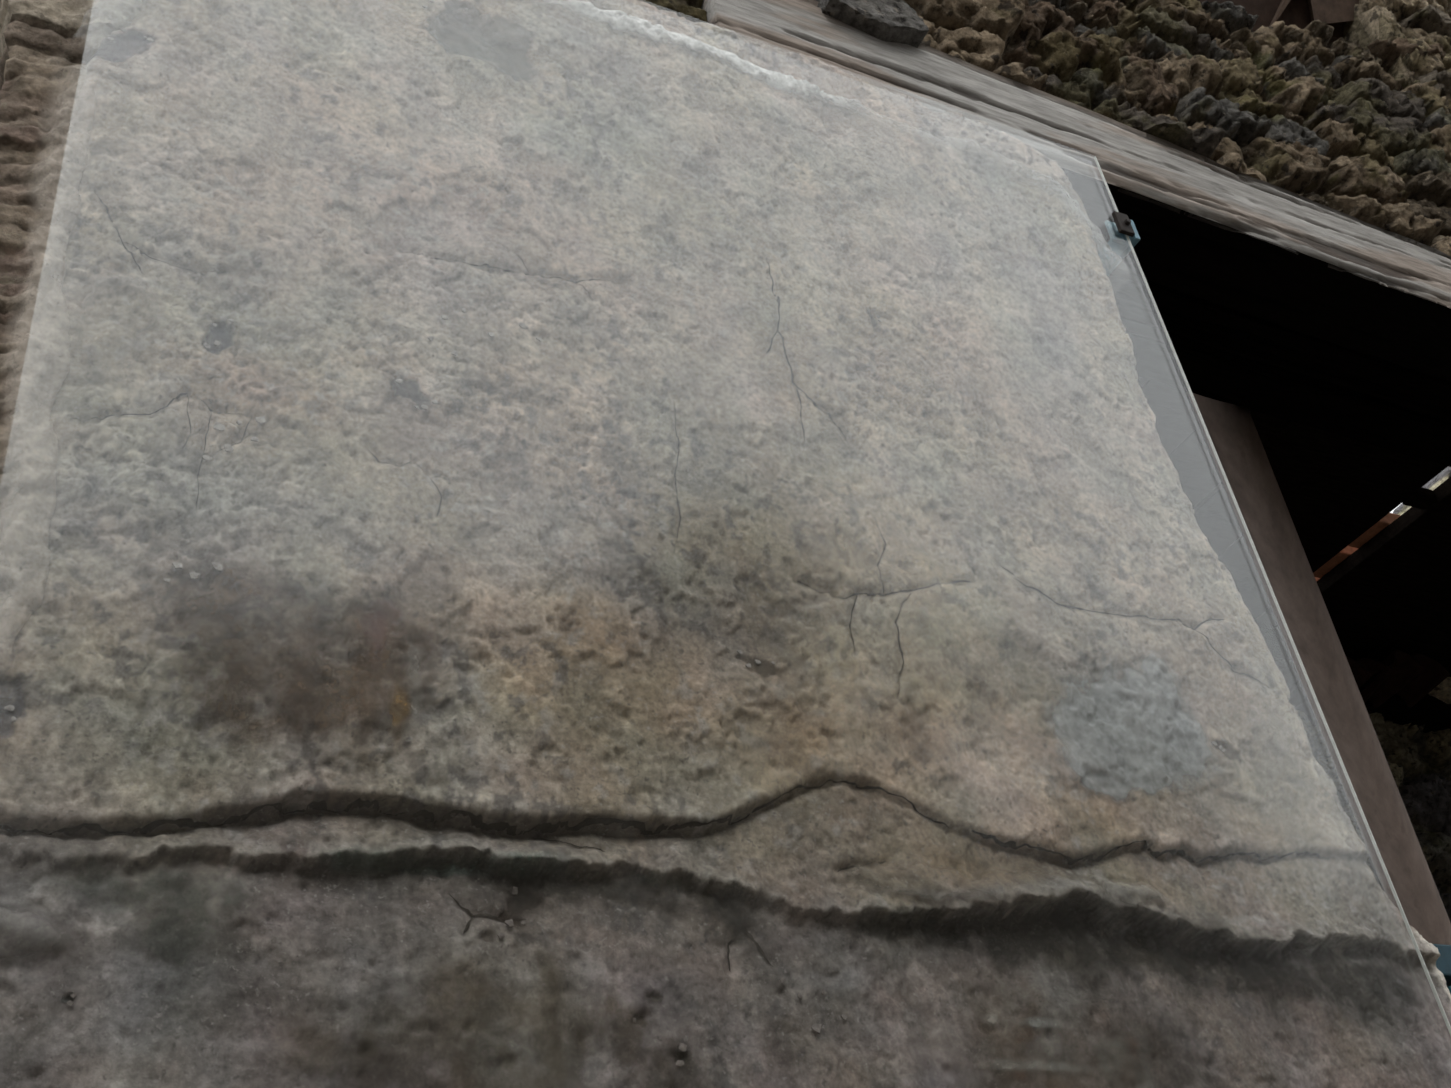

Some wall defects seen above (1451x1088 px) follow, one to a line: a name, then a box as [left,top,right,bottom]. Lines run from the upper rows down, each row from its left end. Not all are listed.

crack [766,258,847,444]
crack [73,393,252,504]
crack [365,446,445,516]
leakage [173,566,424,739]
crack [797,517,969,699]
crack [1001,566,1273,690]
leakage [861,901,1414,1023]